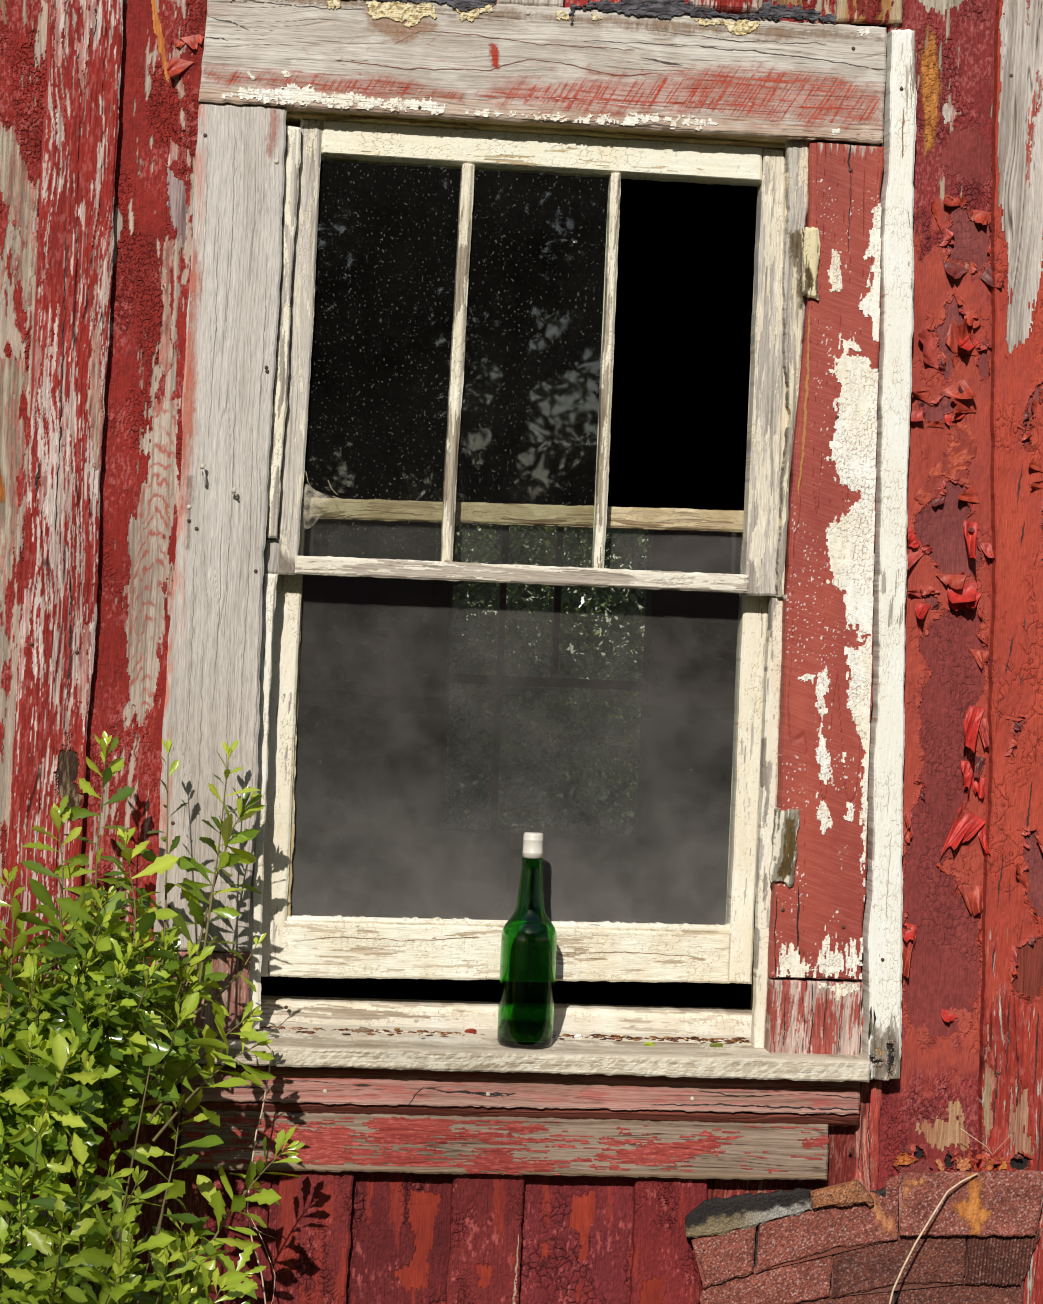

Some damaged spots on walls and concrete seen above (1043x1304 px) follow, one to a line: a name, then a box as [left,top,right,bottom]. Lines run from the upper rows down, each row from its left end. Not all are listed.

peeling [53,0,98,94]
peeling [465,108,619,125]
peeling [0,121,49,312]
peeling [159,137,188,376]
peeling [910,0,1043,428]
peeling [0,352,47,601]
peeling [85,307,103,470]
peeling [122,398,181,729]
peeling [815,667,830,718]
peeling [895,478,1036,1173]
peeling [1009,828,1043,1004]
crack [409,1087,515,1104]